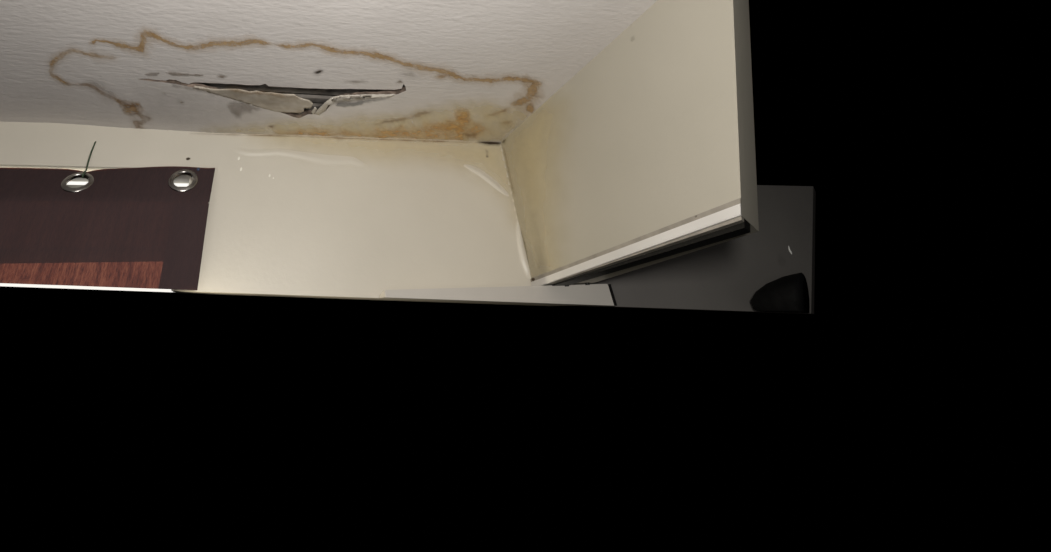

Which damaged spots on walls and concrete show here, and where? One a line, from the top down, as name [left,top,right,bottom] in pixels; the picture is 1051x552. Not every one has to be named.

water stain [85,32,267,56]
water stain [117,101,140,127]
peeling [169,73,405,115]
water stain [275,43,538,141]